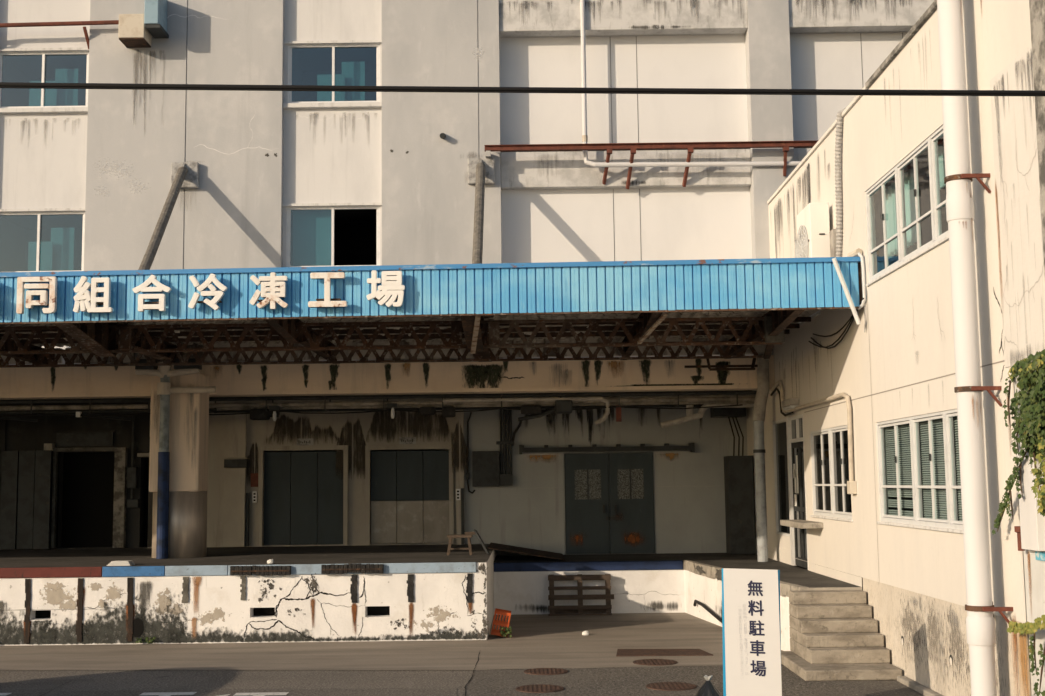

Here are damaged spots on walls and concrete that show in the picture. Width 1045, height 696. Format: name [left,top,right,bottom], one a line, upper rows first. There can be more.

rust [353,317,447,343]
crack [993,255,1044,382]
peeling [40,581,77,611]
peeling [88,582,122,608]
rust [192,577,201,636]
crack [244,577,366,642]
damp [897,599,970,695]